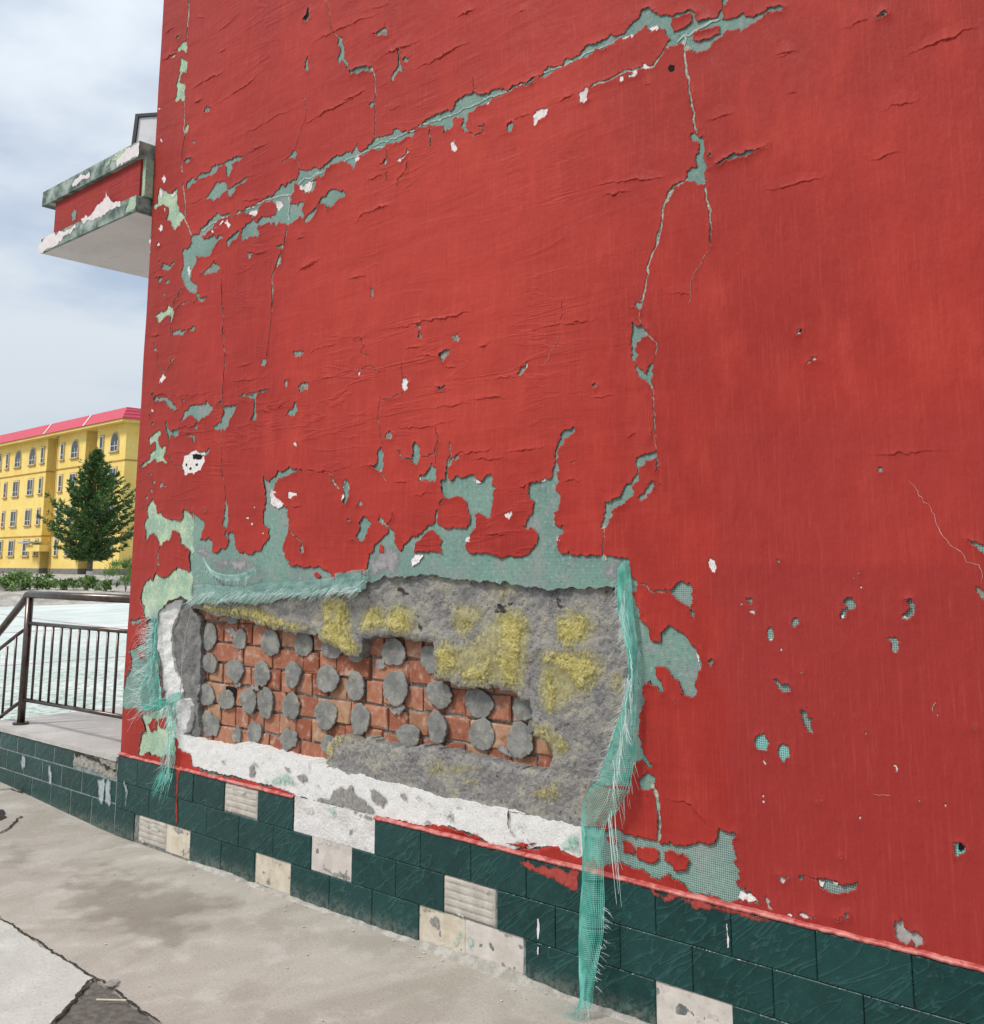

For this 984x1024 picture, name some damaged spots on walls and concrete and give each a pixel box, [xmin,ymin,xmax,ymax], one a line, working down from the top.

peeling [105,142,139,167]
peeling [149,0,783,322]
peeling [38,194,136,253]
crack [631,40,763,434]
crack [908,481,984,600]
peeling [840,598,856,619]
peeling [901,598,915,620]
peeling [123,370,773,910]
peeling [894,919,923,948]